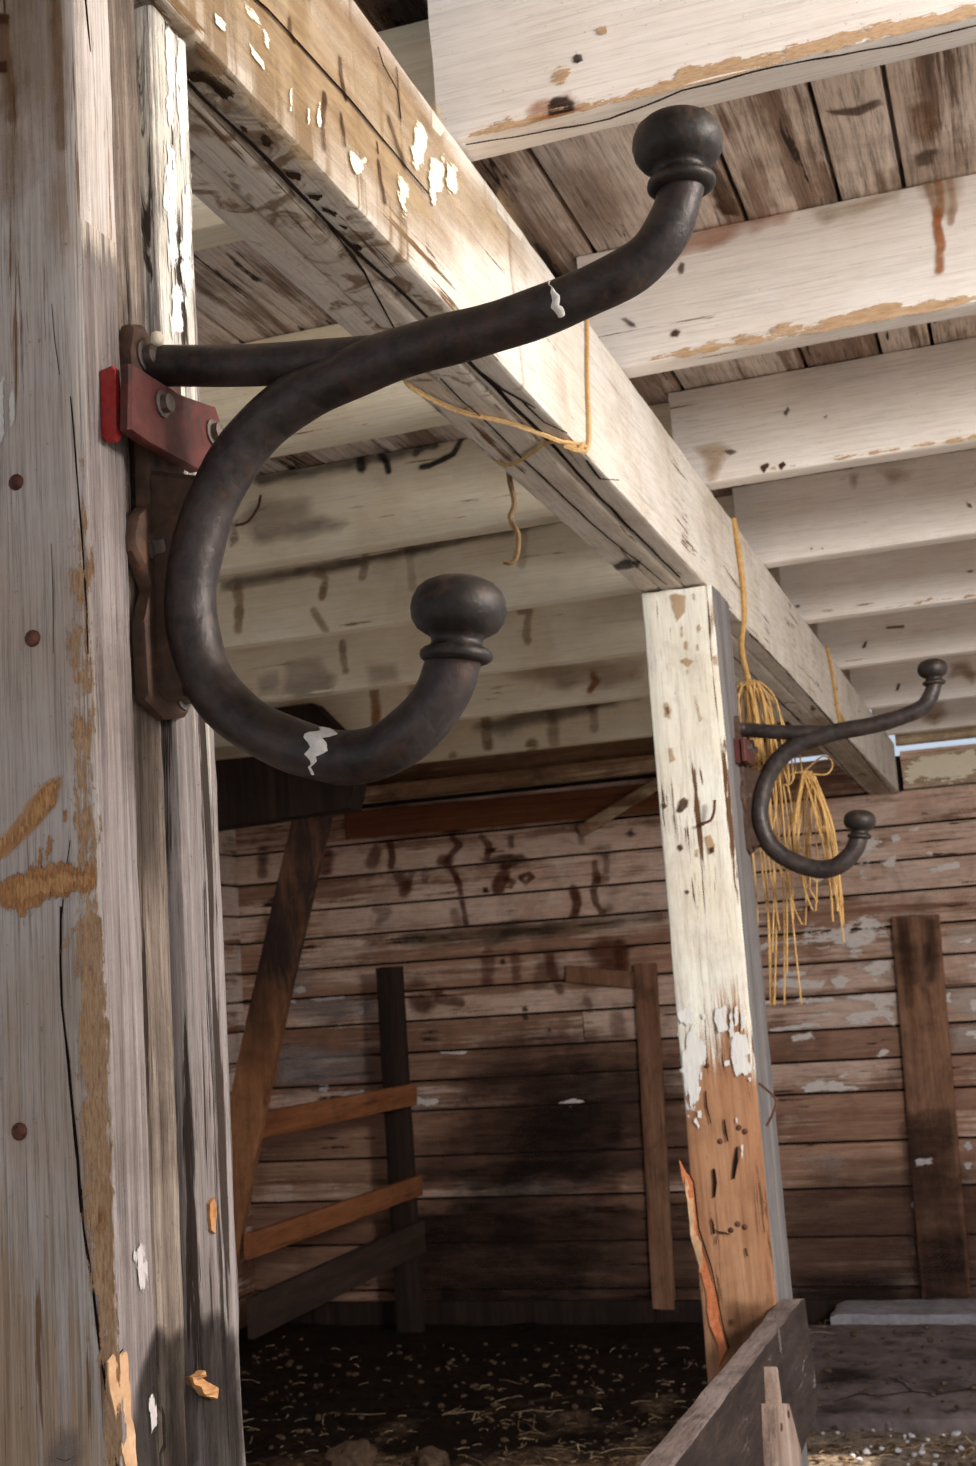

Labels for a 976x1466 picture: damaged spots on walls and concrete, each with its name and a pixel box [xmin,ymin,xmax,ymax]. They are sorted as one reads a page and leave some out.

peeling [245,2,270,69]
peeling [290,88,322,127]
peeling [466,4,976,145]
peeling [349,151,367,174]
peeling [397,120,458,219]
corrosion [933,180,945,273]
peeling [650,295,976,361]
spalling [0,778,96,925]
peeling [760,914,898,1042]
peeling [677,1005,755,1128]
peeling [801,1073,859,1092]
crack [59,900,123,1390]